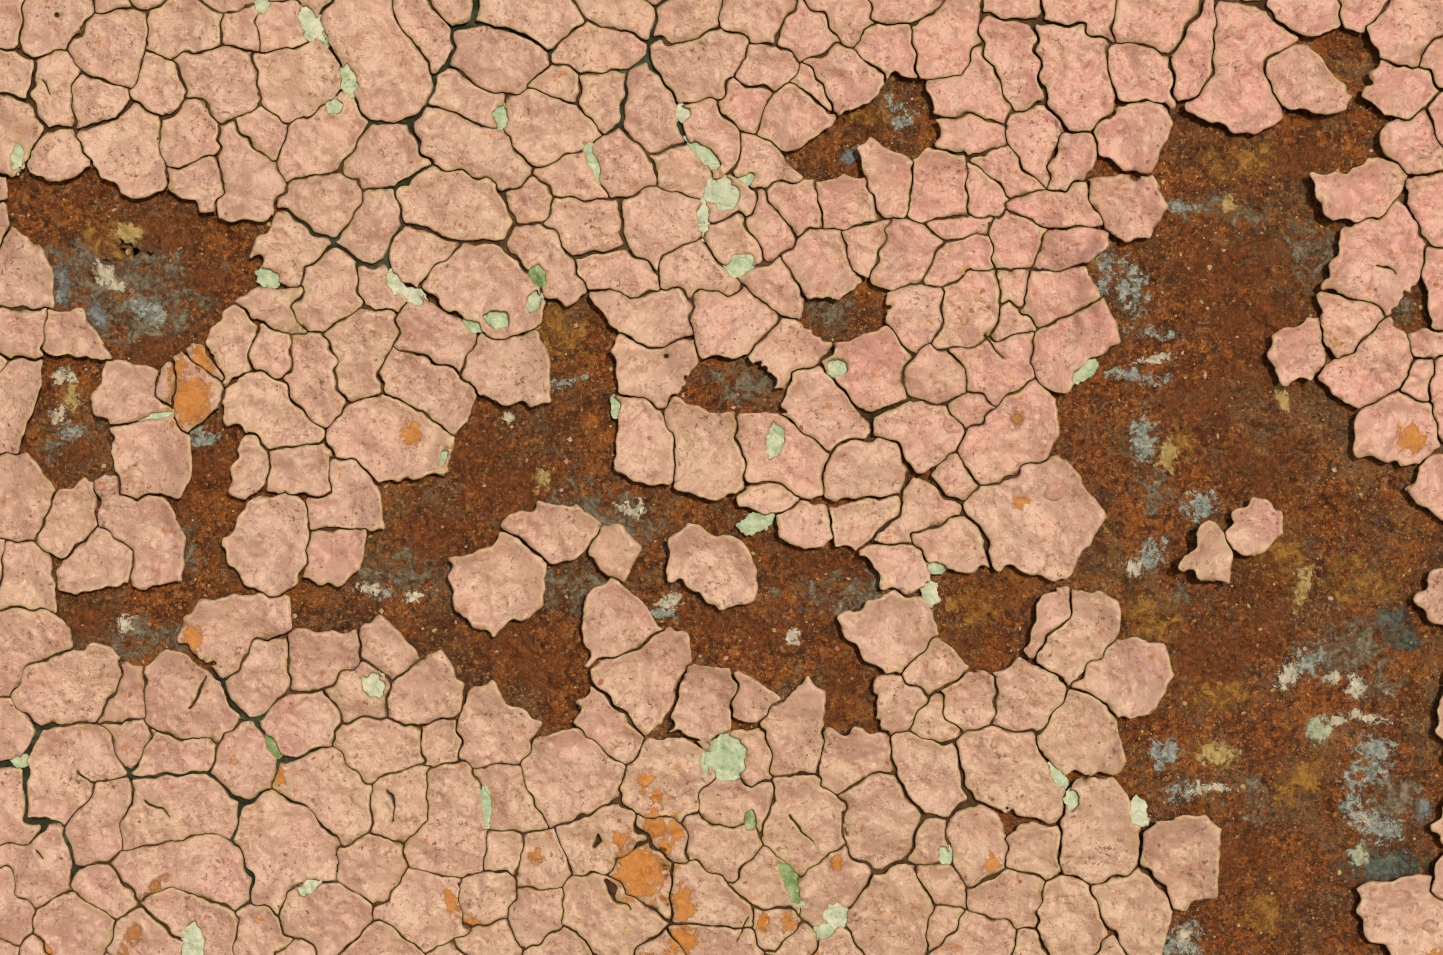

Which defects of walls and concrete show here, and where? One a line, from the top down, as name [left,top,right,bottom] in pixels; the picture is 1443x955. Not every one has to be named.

crack [274,0,560,275]
peeling [1035,0,1352,175]
peeling [1266,0,1443,521]
corrosion [0,153,339,675]
peeling [0,0,1044,955]
corrosion [265,275,1099,751]
corrosion [1034,15,1443,955]
crack [0,719,183,941]
crack [77,676,334,910]
corrosion [609,772,699,955]
crack [862,736,989,891]
peeling [1356,807,1443,955]